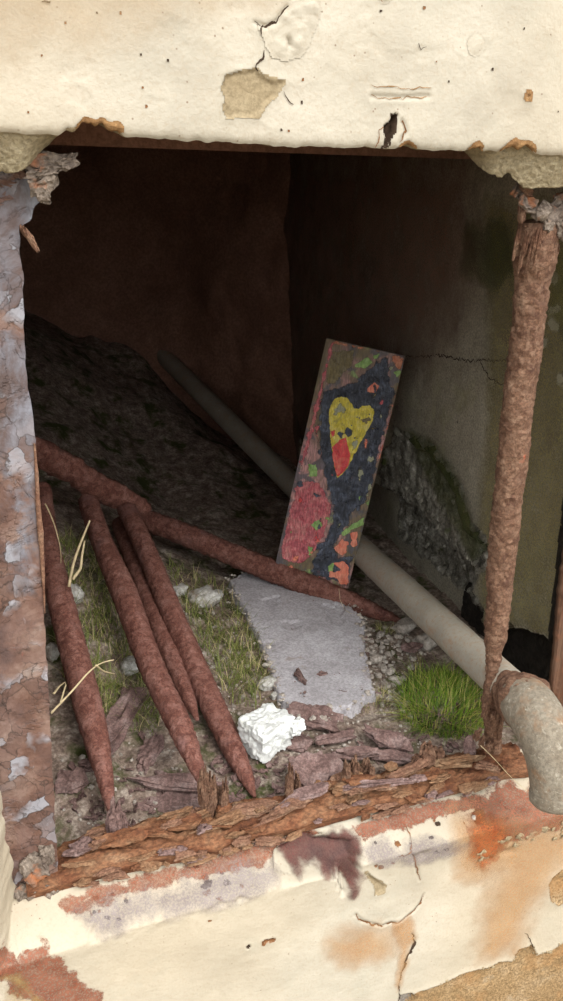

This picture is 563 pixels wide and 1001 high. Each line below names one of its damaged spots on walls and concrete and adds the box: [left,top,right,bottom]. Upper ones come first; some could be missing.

peeling [221,67,286,119]
crack [401,353,506,385]
flaking render [379,425,488,637]
flaking render [502,628,553,682]
corrosion [352,778,563,873]
crack [356,826,423,1001]
peeling [549,870,563,906]
corrosion [0,938,103,1001]
peeling [400,943,563,1001]